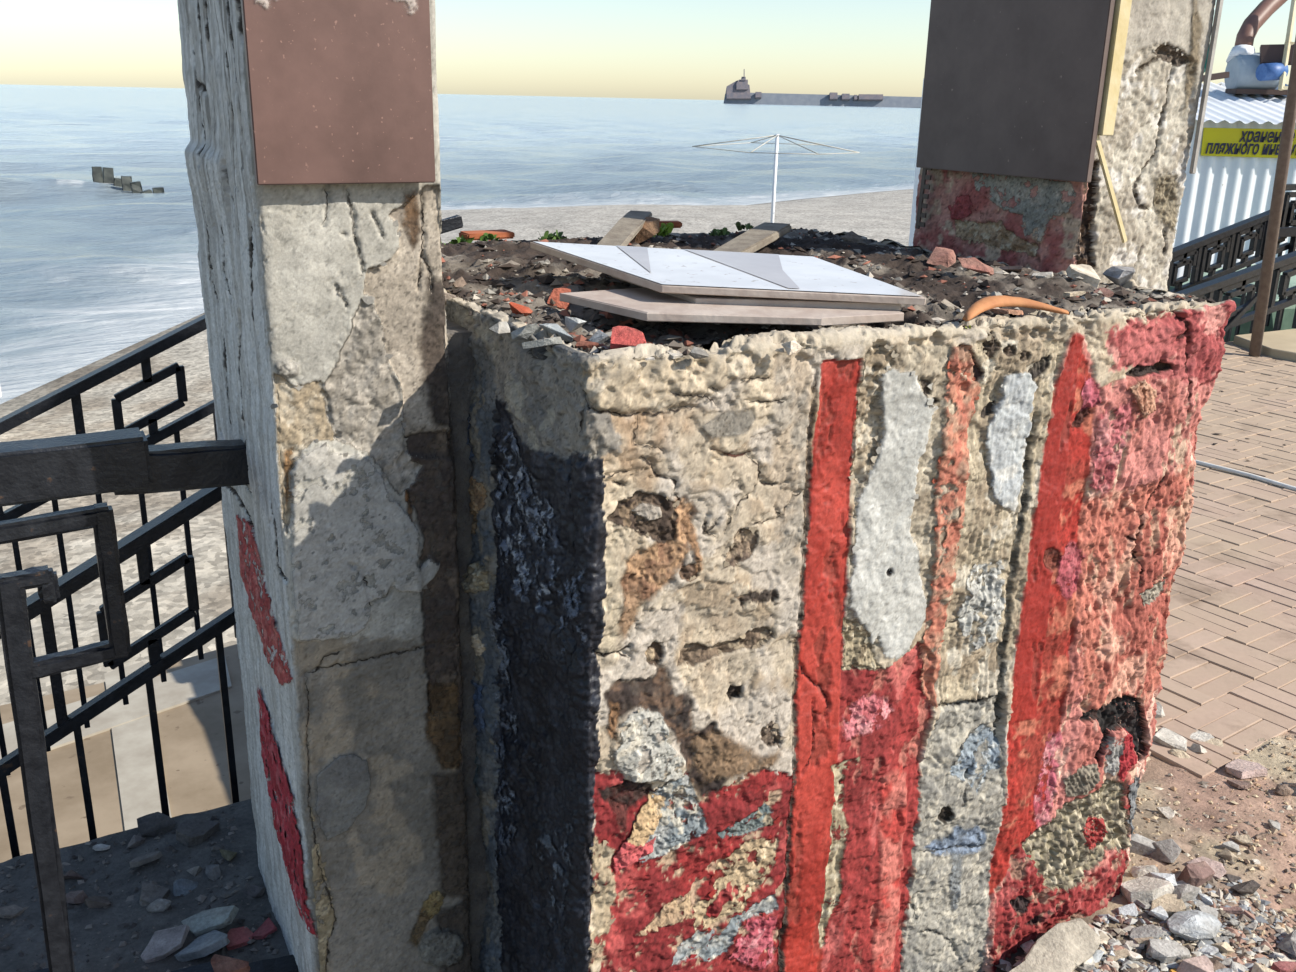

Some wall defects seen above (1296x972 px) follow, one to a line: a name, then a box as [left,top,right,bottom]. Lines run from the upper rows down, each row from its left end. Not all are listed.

crack [324,189,385,306]
crack [418,193,432,290]
flaking render [948,161,1098,267]
crack [1133,56,1171,266]
flaking render [271,185,451,641]
peeling [236,515,293,685]
flaking render [608,491,680,544]
flaking render [677,627,774,666]
flaking render [723,526,759,568]
crack [1127,468,1166,586]
peeling [257,688,334,972]
flaking render [1021,695,1146,891]